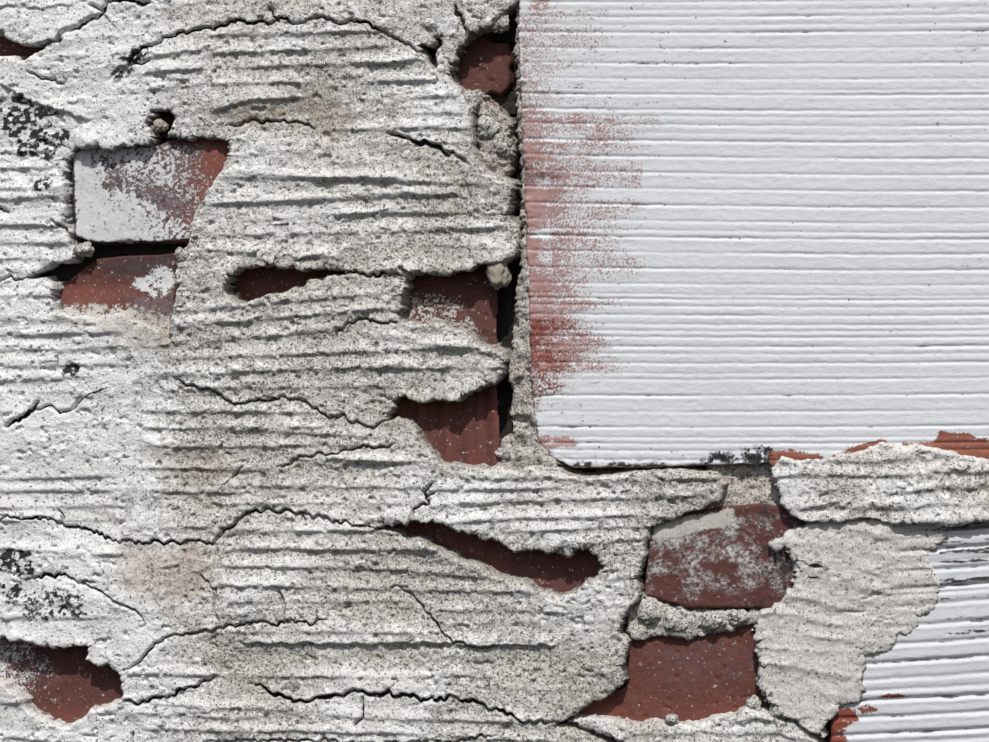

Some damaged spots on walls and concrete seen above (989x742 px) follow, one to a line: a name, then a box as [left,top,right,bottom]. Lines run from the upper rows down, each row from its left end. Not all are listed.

crack [113,10,423,76]
spalling [58,138,230,334]
crack [175,378,393,467]
spalling [393,384,501,466]
crack [0,508,387,545]
spalling [385,521,604,593]
spalling [644,503,806,609]
crack [35,572,327,670]
spalling [0,636,123,723]
crack [123,678,213,705]
crack [207,683,552,742]
spalling [578,624,768,721]